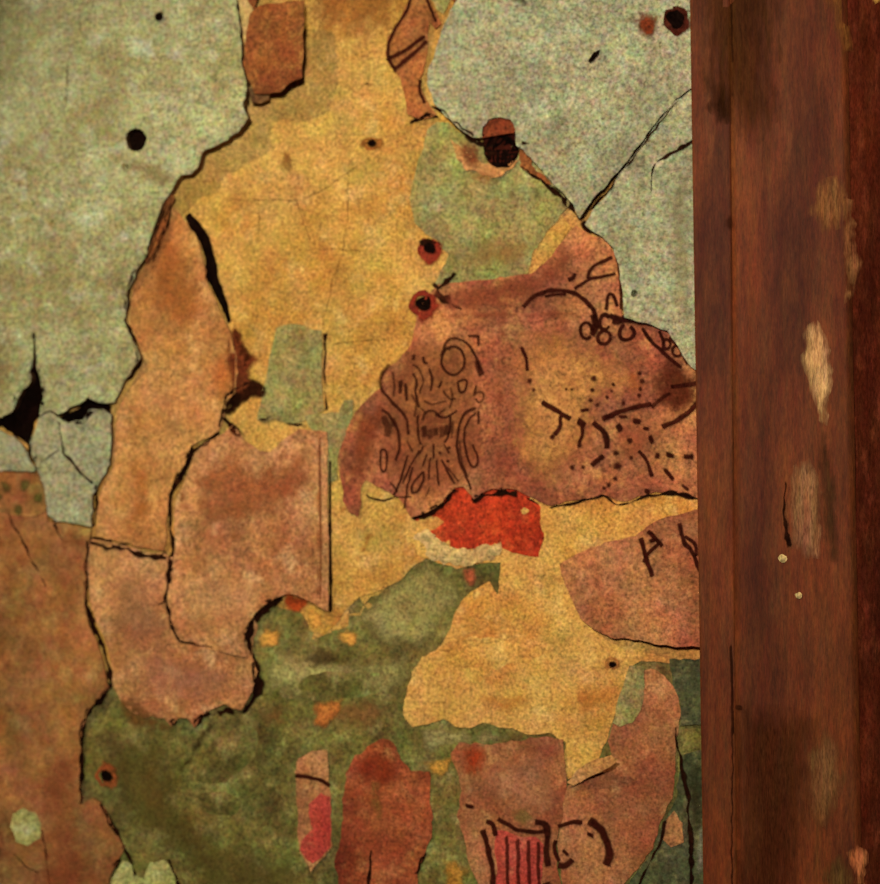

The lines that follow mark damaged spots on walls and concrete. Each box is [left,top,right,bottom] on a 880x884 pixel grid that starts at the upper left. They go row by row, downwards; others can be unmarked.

rust [639,6,690,35]
crack [410,106,497,157]
crack [522,101,692,234]
crack [124,201,231,381]
rust [414,295,439,321]
rust [419,240,442,265]
crack [321,333,329,410]
crack [260,416,303,426]
peeling [0,0,703,884]
crack [0,331,240,884]